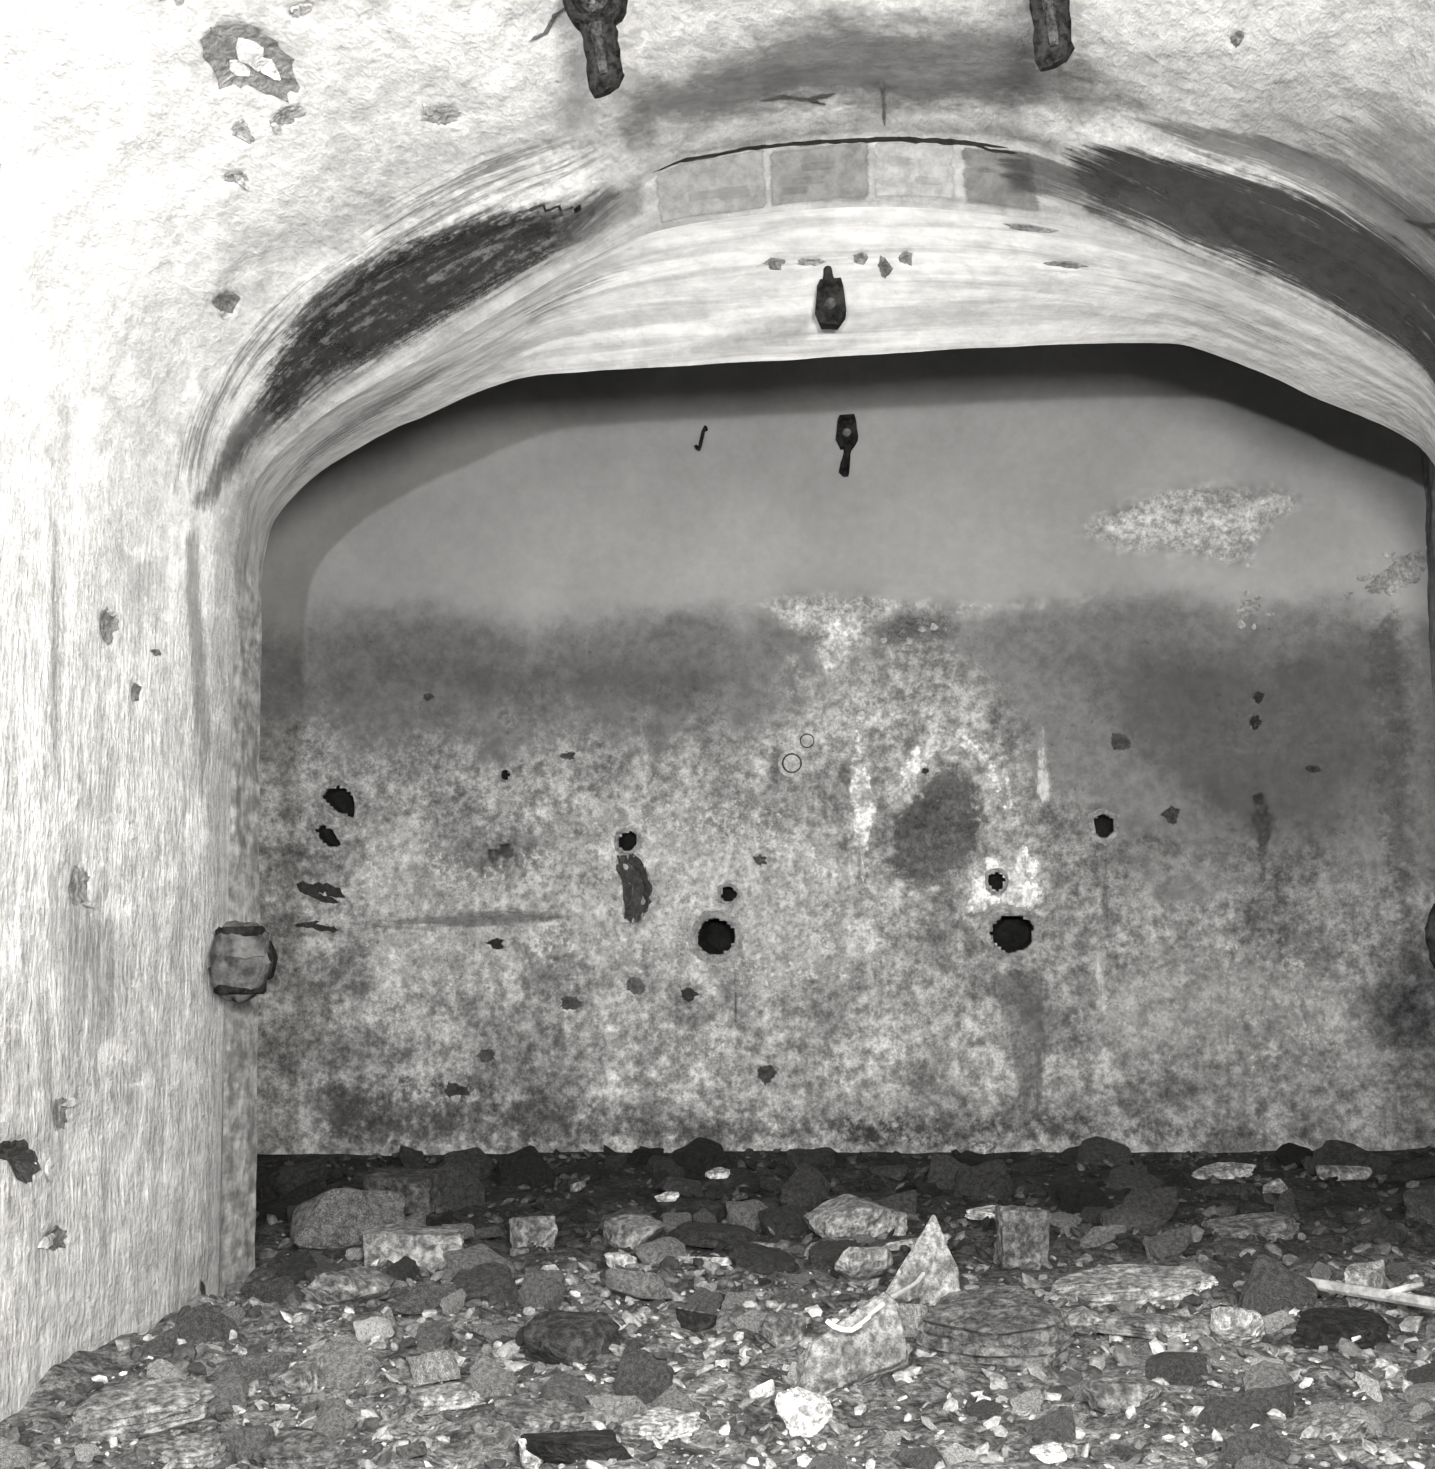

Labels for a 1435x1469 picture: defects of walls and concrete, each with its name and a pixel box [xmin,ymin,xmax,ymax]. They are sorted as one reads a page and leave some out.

spalling [200,24,307,134]
spalling [232,118,255,144]
water stain [310,148,640,363]
water stain [999,121,1435,383]
water stain [290,370,442,486]
water stain [1091,490,1293,558]
water stain [774,600,964,685]
water stain [849,711,1041,914]
water stain [1037,750,1049,802]
water stain [1096,957,1106,1011]
spalling [0,1122,56,1184]